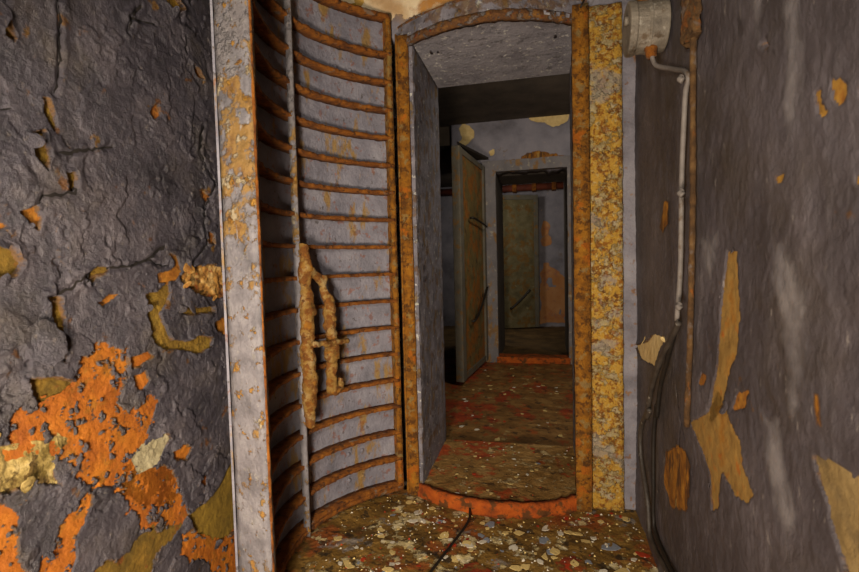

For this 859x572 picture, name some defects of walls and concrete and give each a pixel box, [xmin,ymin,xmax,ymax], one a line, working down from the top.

corrosion [406,8,572,46]
peeling [23,131,49,164]
peeling [44,102,55,130]
corrosion [512,151,565,160]
peeling [20,207,40,231]
spalling [0,223,19,287]
peeling [143,254,225,356]
peeling [691,248,753,511]
peeling [0,296,236,572]
peeling [816,455,859,572]